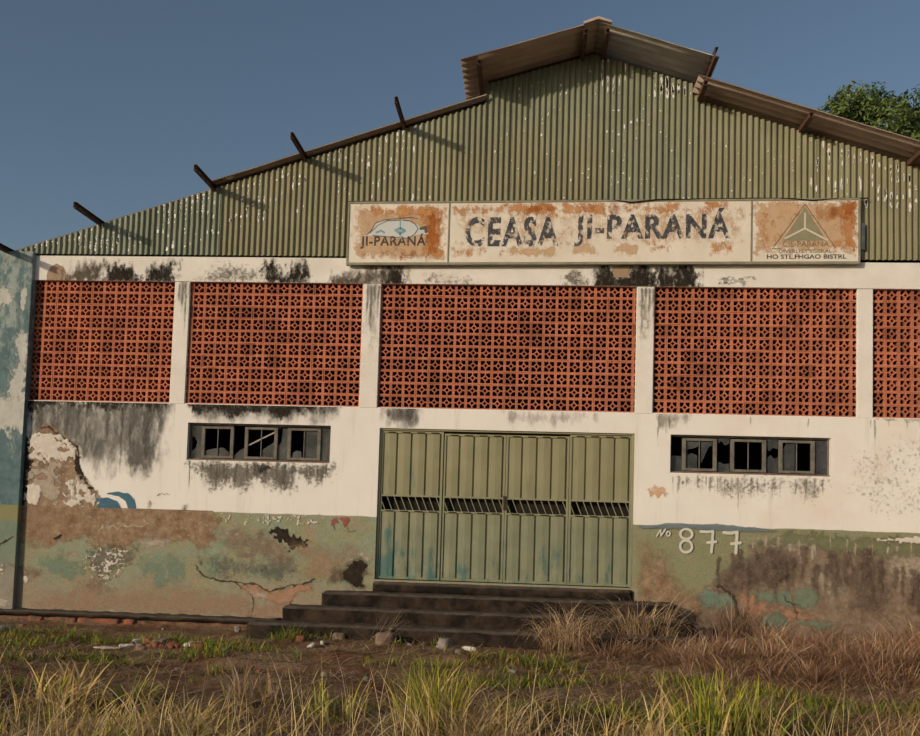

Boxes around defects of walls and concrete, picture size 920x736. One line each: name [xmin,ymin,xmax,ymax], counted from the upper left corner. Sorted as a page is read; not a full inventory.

peeling [590,59,627,95]
peeling [649,76,691,99]
peeling [327,126,421,197]
leakage [208,258,310,283]
leakage [28,401,168,469]
peeling [0,330,324,606]
leakage [189,460,336,491]
crack [195,565,315,618]
flaking render [329,552,371,589]
peeling [637,530,920,643]